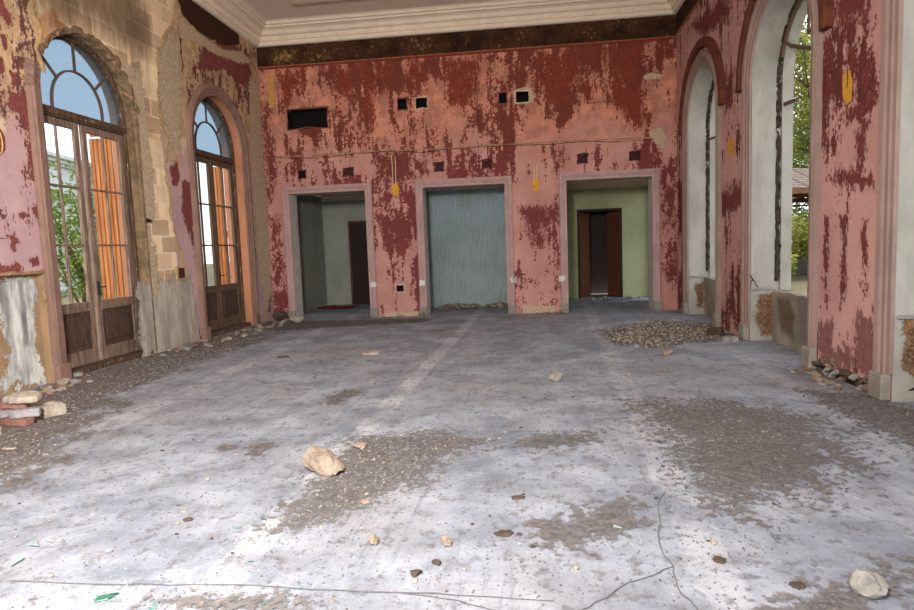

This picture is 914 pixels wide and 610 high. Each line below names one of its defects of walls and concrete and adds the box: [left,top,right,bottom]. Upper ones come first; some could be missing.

peeling [0,0,35,182]
peeling [397,54,483,116]
peeling [498,41,667,149]
peeling [822,0,879,196]
peeling [0,231,40,278]
peeling [19,203,39,224]
flaking render [29,0,431,358]
peeling [514,199,559,255]
peeling [661,175,682,292]
peeling [722,178,741,219]
peeling [811,213,874,393]
crack [580,492,699,610]